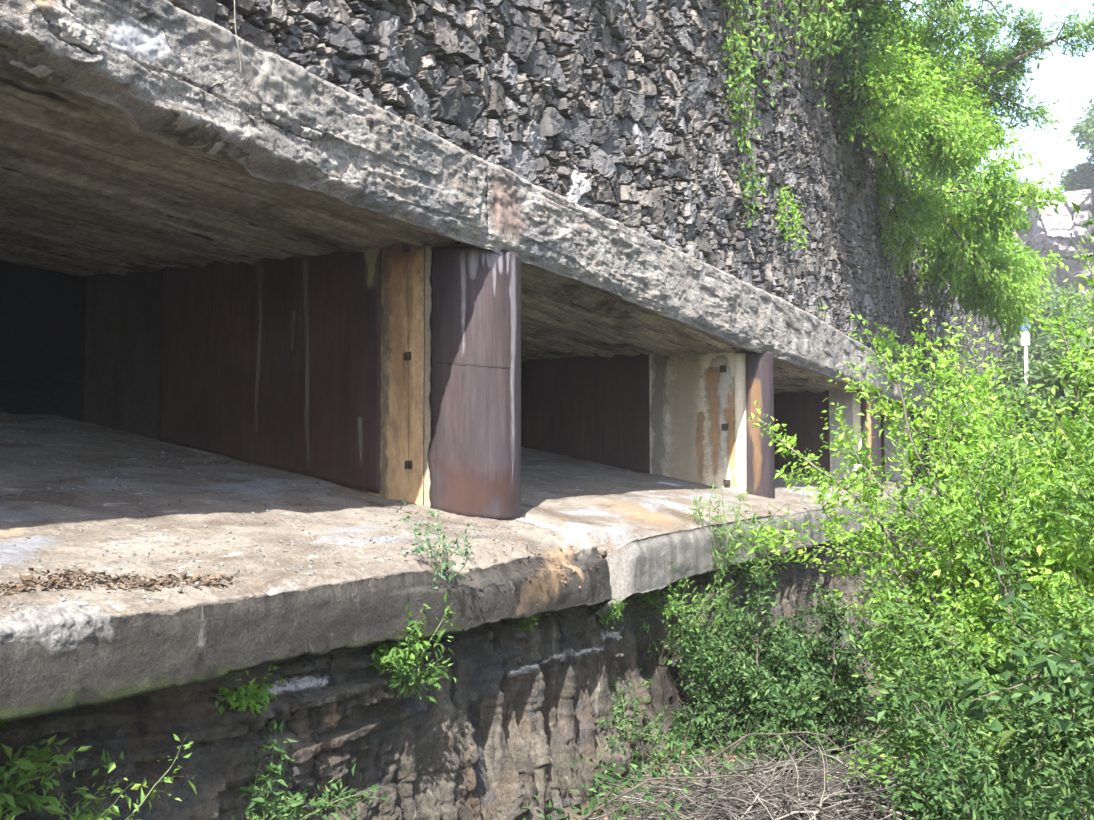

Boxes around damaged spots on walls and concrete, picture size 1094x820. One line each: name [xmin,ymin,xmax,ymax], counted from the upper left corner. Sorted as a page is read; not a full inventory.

corrosion [696,367,736,490]
corrosion [517,550,583,613]